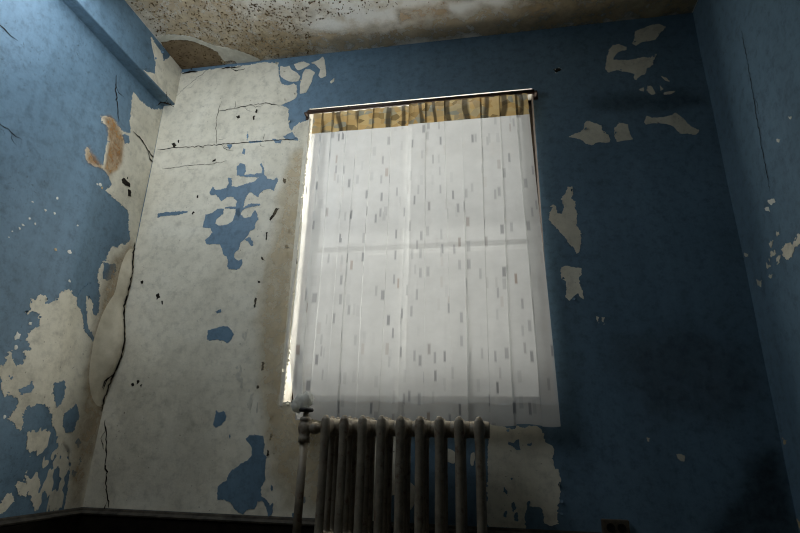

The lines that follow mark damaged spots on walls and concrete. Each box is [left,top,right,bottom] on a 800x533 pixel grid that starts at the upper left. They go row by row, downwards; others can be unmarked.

peeling [605,24,675,95]
peeling [569,121,633,145]
peeling [644,113,699,135]
peeling [549,187,582,254]
peeling [0,0,396,518]
peeling [560,266,584,301]
peeling [756,231,800,287]
crack [101,243,135,509]
peeling [486,424,563,528]